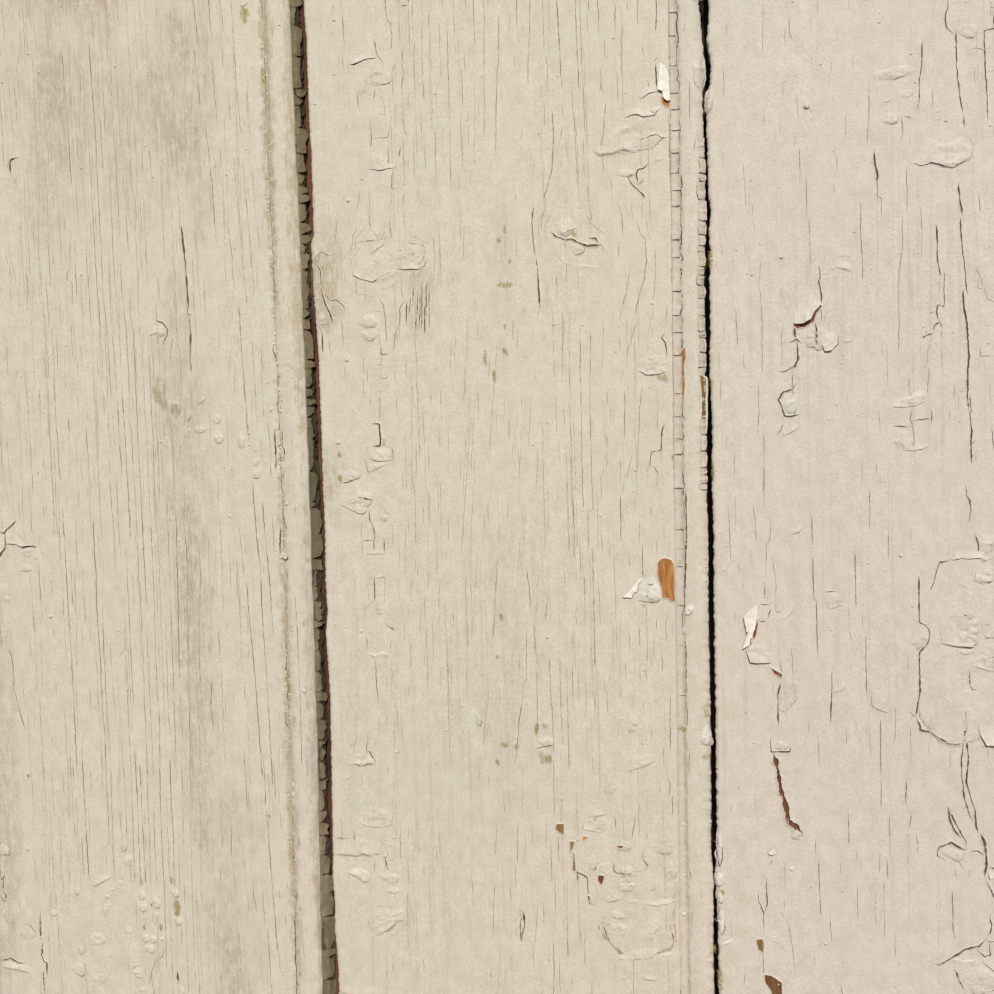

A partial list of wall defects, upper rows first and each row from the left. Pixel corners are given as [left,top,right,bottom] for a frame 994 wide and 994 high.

peeling [592,58,670,157]
crack [722,0,934,426]
peeling [340,422,393,514]
crack [861,462,912,559]
crack [943,486,973,522]
peeling [623,556,677,604]
peeling [743,603,797,725]
peeling [910,533,994,755]
crack [730,517,994,994]
peeling [554,809,680,960]
peeling [763,970,784,994]
peeling [931,915,994,994]